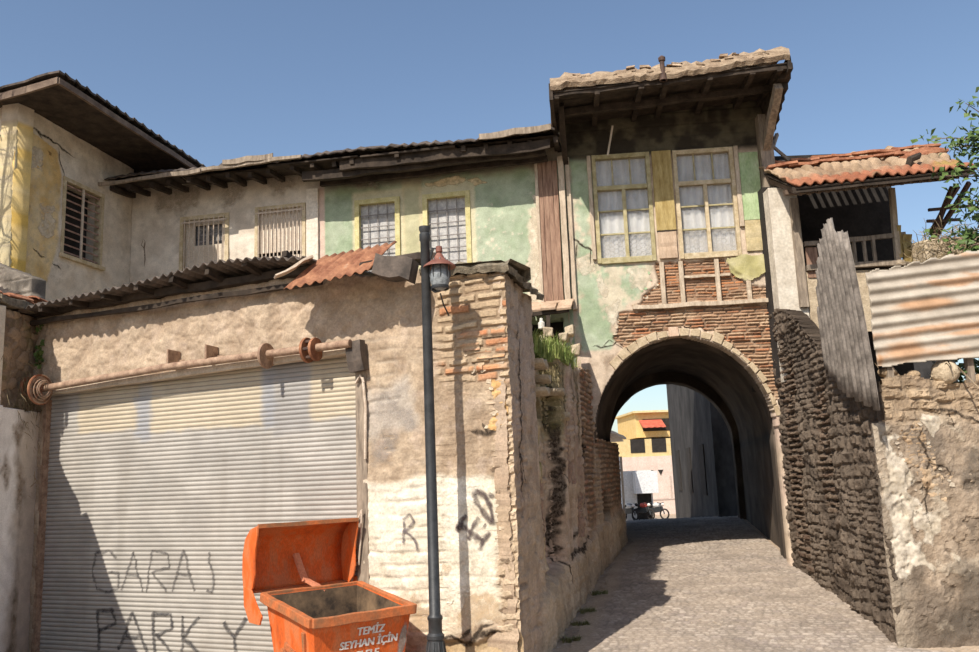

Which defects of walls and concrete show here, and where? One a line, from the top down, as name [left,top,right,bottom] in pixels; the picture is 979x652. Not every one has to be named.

crack [33,127,73,172]
spalling [459,326,508,431]
spalling [576,253,778,400]
peeling [882,414,955,578]
crack [915,408,979,536]